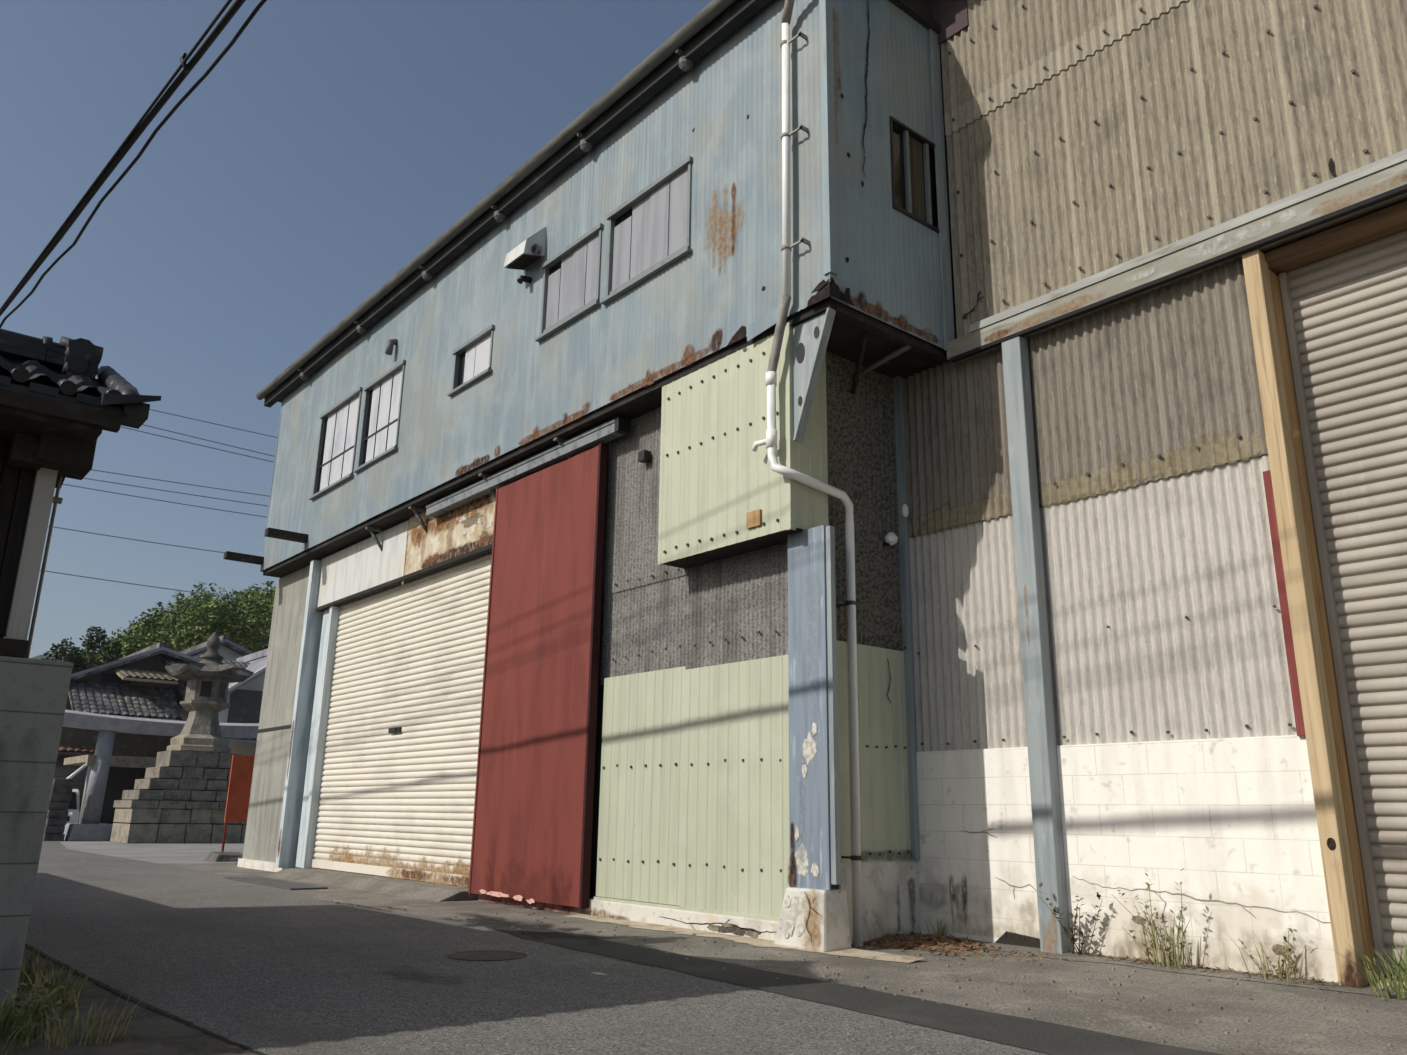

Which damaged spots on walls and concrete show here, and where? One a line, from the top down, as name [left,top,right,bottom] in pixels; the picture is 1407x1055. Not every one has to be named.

crack [862,2,870,178]
corrosion [708,183,742,271]
corrosion [850,292,938,343]
corrosion [402,495,493,586]
peeling [802,722,817,778]
crack [996,877,1037,899]
crack [1073,876,1330,923]